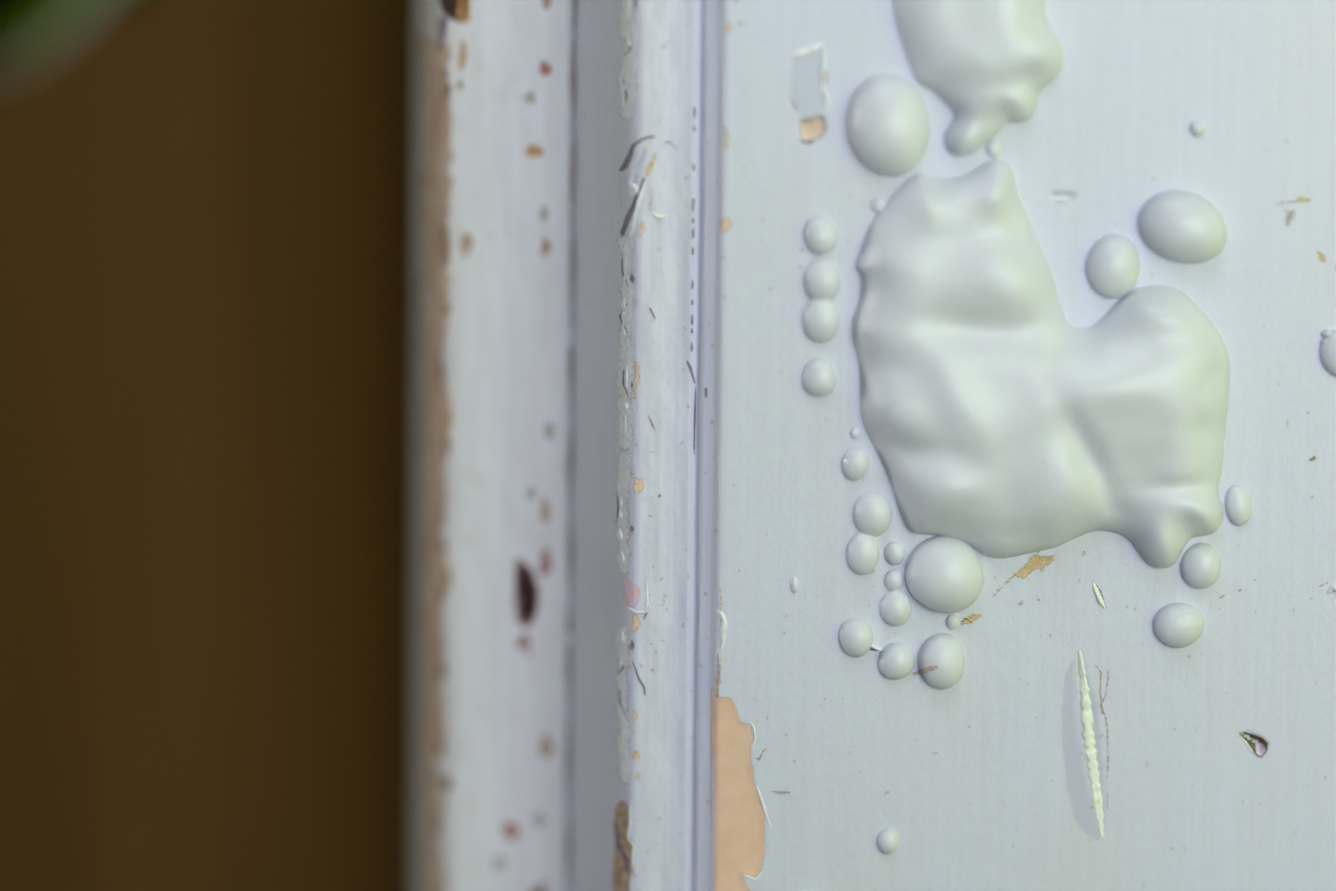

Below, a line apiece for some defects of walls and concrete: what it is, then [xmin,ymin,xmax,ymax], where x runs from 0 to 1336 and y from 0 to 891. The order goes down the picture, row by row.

peeling [792,43,828,144]
peeling [711,591,771,891]